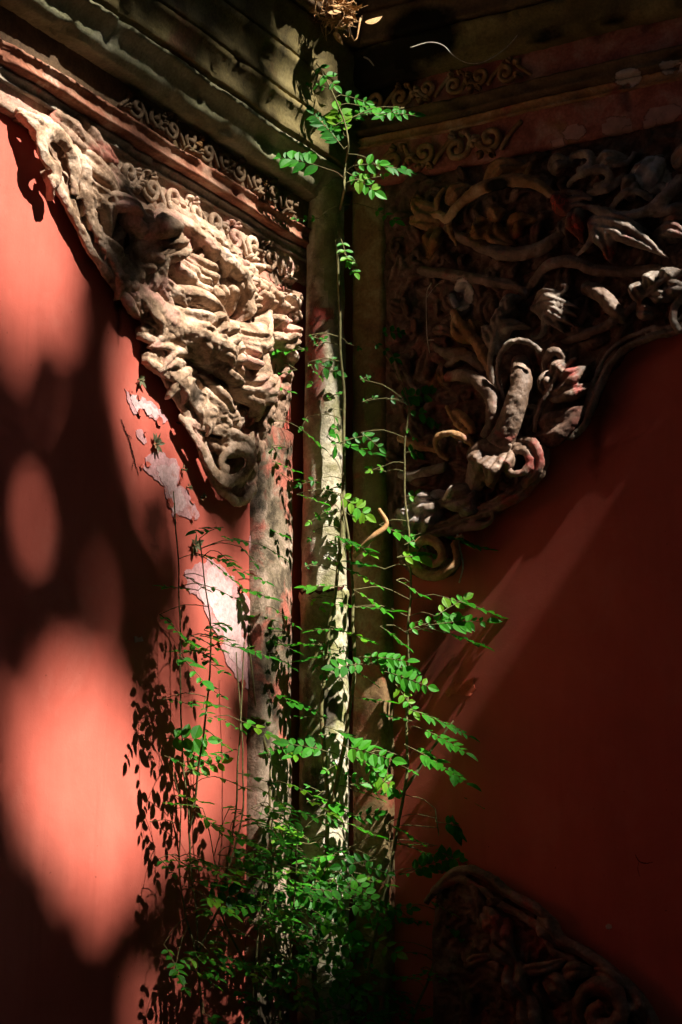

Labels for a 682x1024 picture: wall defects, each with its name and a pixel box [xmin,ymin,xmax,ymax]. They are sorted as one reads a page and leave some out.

peeling [125,389,168,426]
peeling [136,429,200,522]
peeling [182,558,251,690]